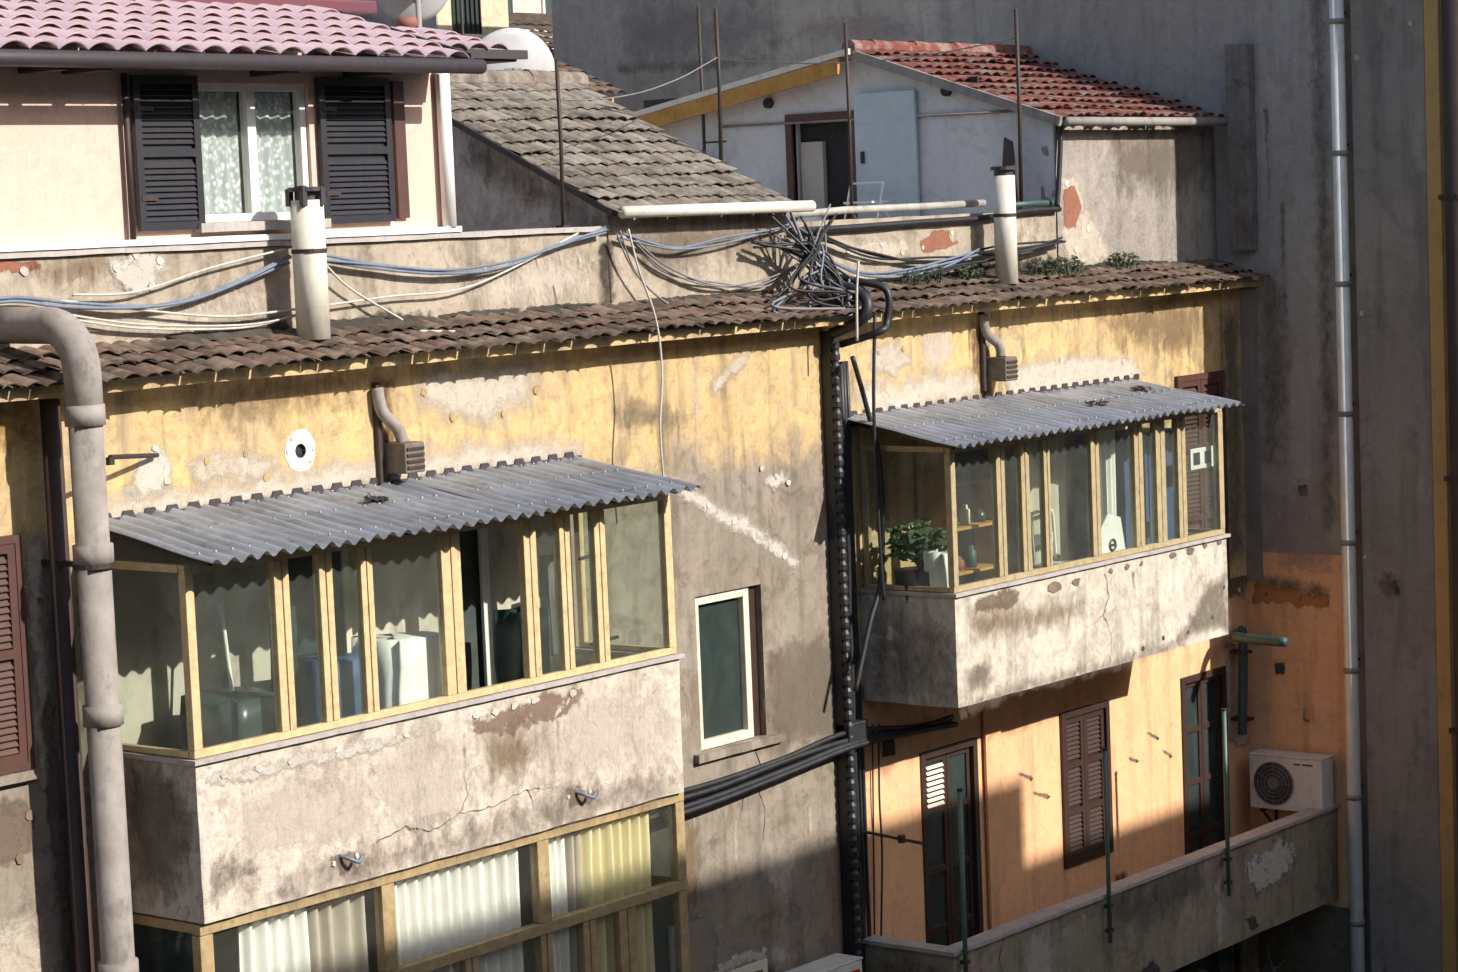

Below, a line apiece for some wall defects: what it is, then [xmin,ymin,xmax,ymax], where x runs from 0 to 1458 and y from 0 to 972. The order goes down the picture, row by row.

spalling [843,230,958,267]
spalling [1061,175,1110,266]
peeling [1169,539,1222,559]
peeling [976,588,1018,612]
leakage [976,605,1073,634]
peeling [1048,578,1080,593]
peeling [1185,576,1329,634]
spalling [472,687,582,737]
peeling [1226,644,1248,747]
spalling [0,692,75,972]
crack [377,776,551,843]
peeling [1245,835,1297,893]